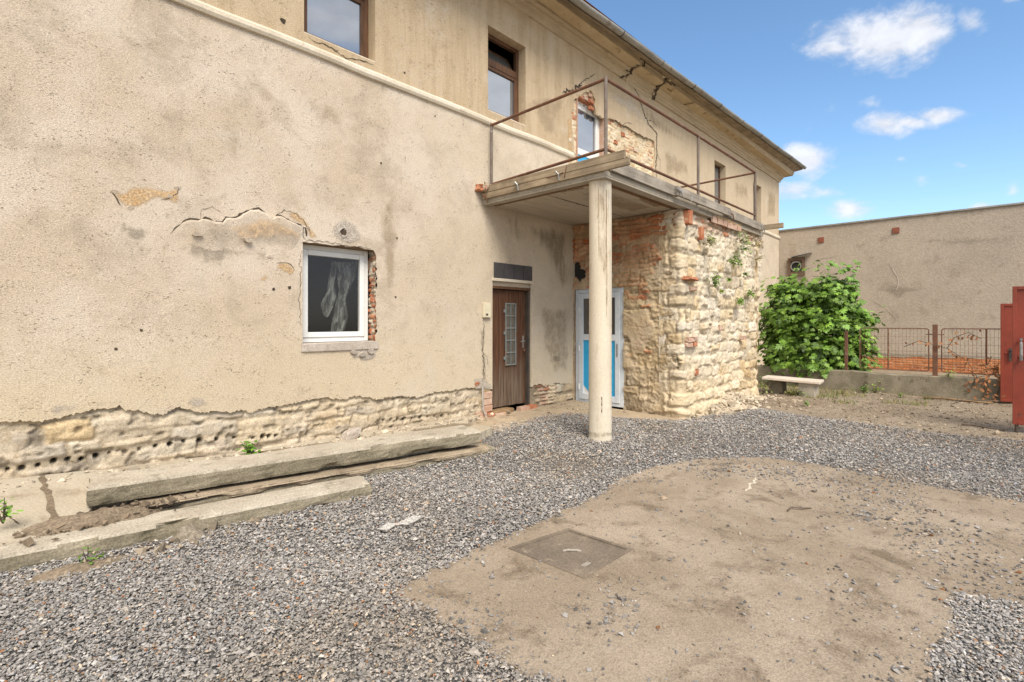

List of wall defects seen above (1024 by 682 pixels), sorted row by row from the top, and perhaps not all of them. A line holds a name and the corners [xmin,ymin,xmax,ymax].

flaking render [568,91,593,164]
crack [563,61,695,199]
flaking render [608,119,654,175]
flaking render [110,186,181,210]
crack [170,206,371,315]